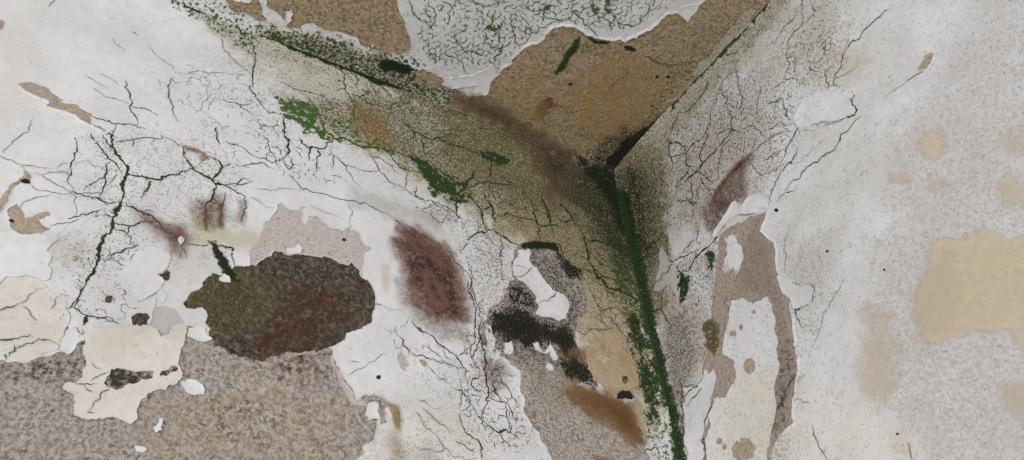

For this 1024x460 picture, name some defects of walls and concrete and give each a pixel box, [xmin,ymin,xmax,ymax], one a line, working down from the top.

crack [409,0,667,74]
spalling [413,0,771,169]
spalling [0,202,404,460]
crack [0,26,639,460]
rust [392,225,469,331]
damp [485,285,598,389]
damp [453,94,657,262]
rust [566,386,643,447]
rust [704,153,752,231]
spalling [702,193,814,460]
crack [646,0,887,460]
damp [915,230,1024,345]